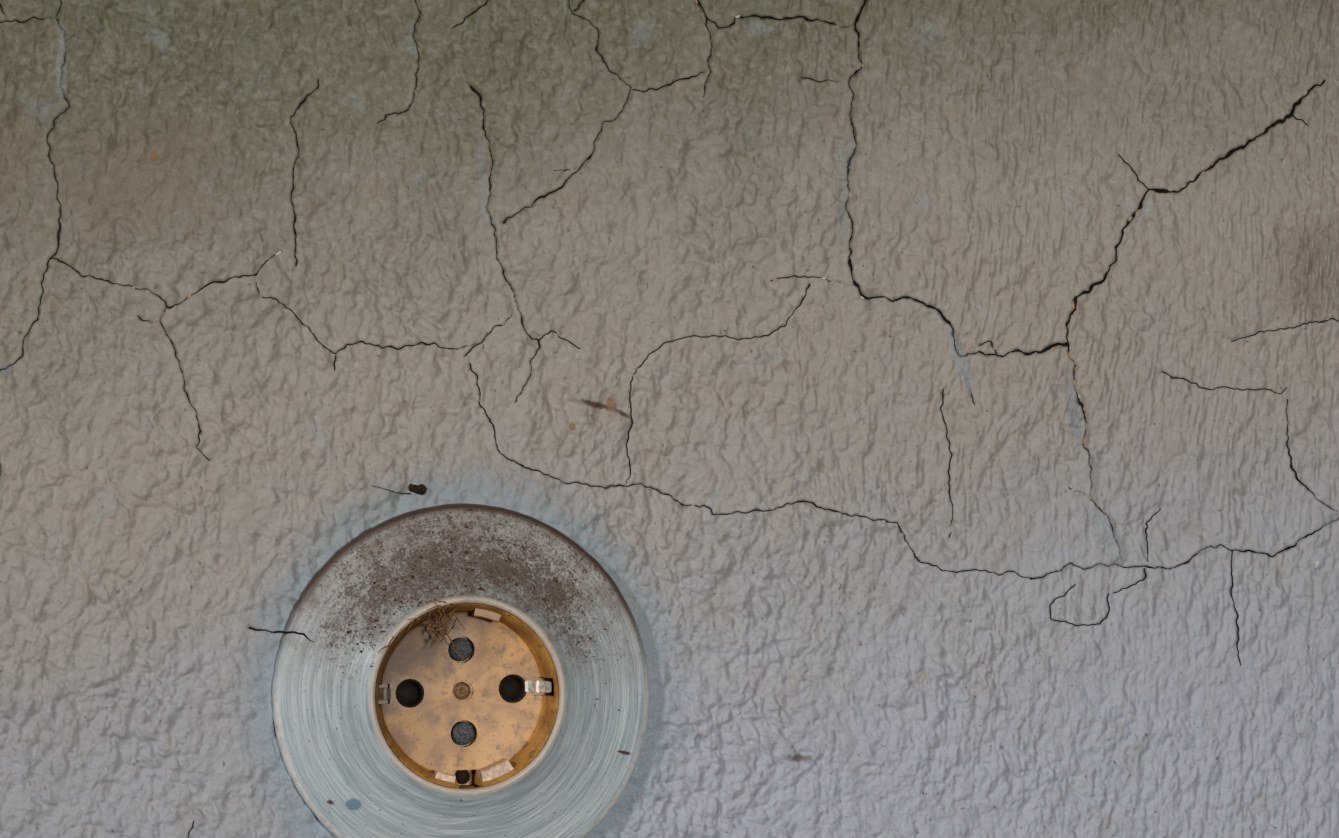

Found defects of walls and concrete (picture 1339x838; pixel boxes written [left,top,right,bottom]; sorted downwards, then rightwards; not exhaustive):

crack [0,0,1339,666]